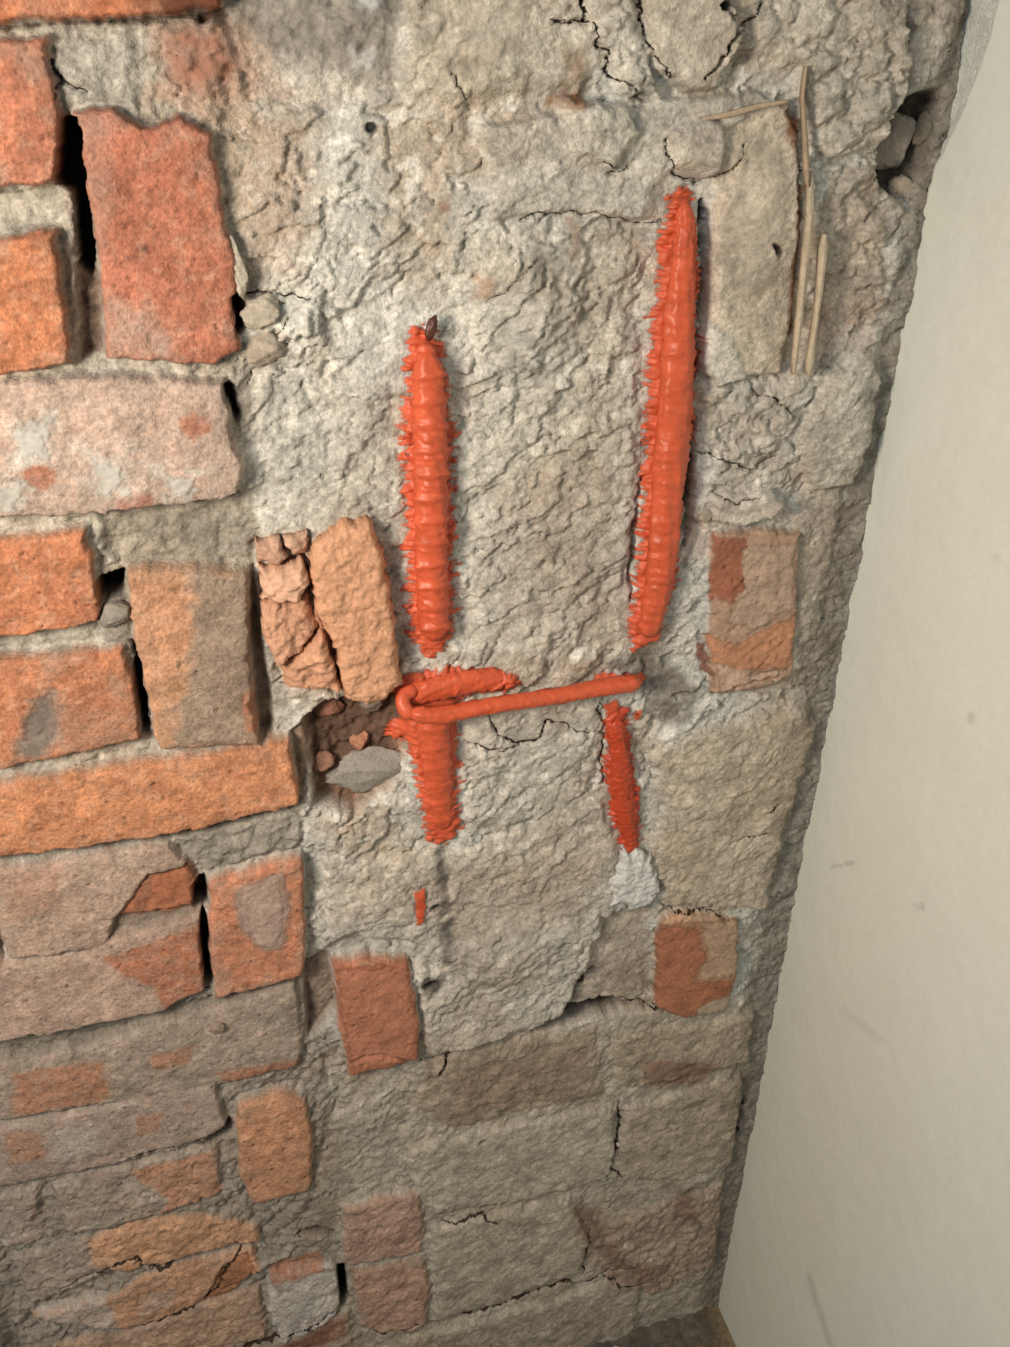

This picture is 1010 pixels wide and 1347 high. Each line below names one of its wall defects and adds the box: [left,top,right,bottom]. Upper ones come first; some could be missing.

spalling [348,45,377,71]
spalling [357,0,385,11]
crack [550,0,636,96]
crack [637,0,671,77]
crack [705,3,762,80]
spalling [131,860,199,914]
spalling [235,874,290,951]
crack [626,998,670,1013]
crack [607,1100,623,1179]